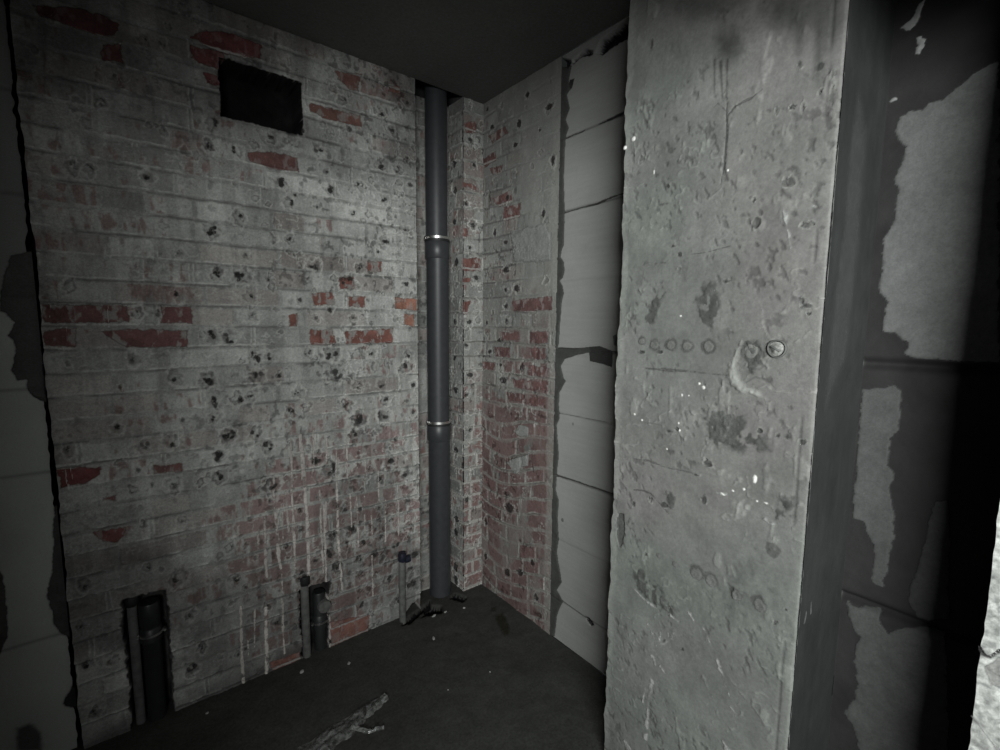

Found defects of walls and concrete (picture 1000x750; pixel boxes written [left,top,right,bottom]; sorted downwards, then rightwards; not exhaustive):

peeling [901,0,926,54]
crack [718,94,756,174]
peeling [878,61,1000,363]
water stain [239,606,269,684]
water stain [257,430,373,654]
peeling [852,385,902,587]
peeling [844,500,951,750]